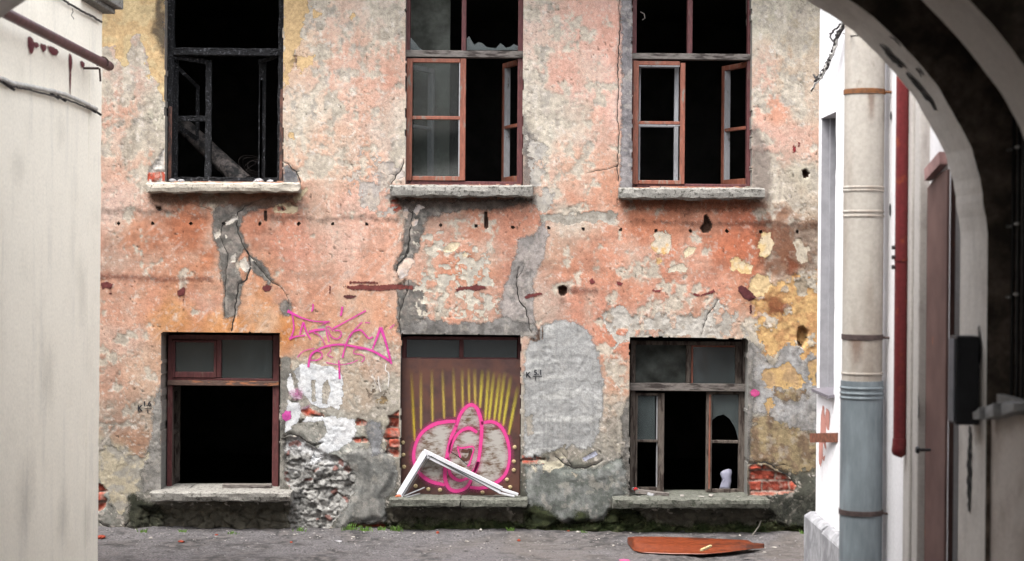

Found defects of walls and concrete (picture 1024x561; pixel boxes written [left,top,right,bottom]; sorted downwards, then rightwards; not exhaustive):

peeling [102,0,165,102]
crack [186,201,289,331]
crack [389,159,413,333]
peeling [342,151,501,321]
crack [516,264,532,333]
flaking render [301,407,324,417]
flaking render [353,418,369,443]
flaking render [366,381,400,457]
peeling [602,230,830,496]